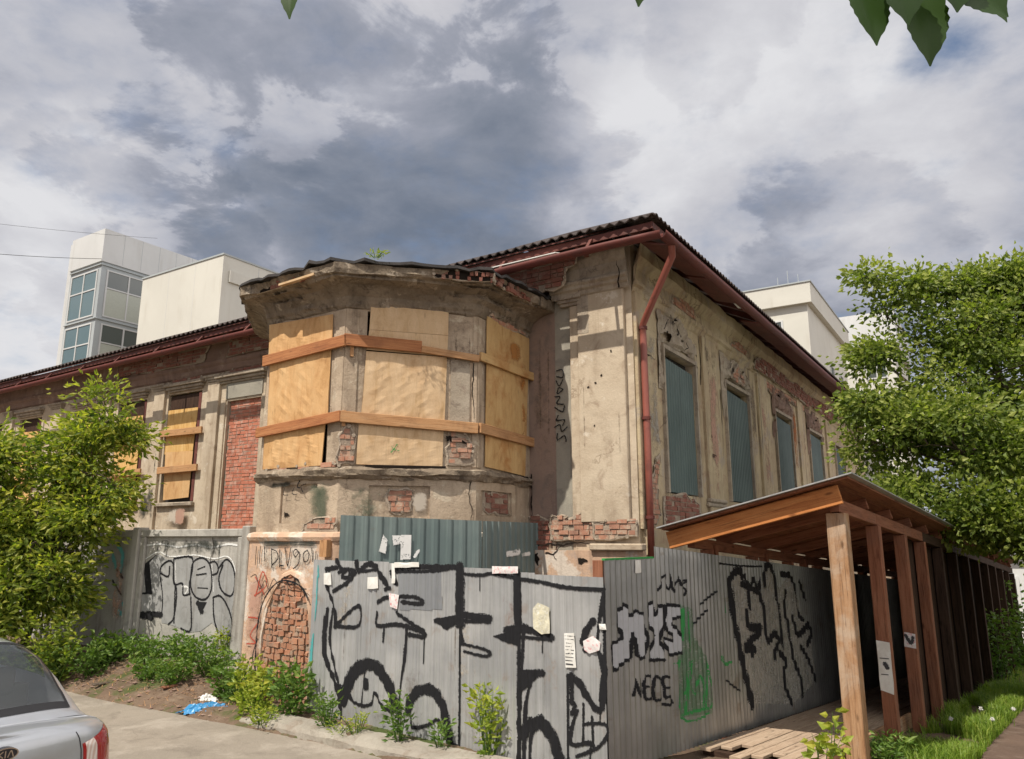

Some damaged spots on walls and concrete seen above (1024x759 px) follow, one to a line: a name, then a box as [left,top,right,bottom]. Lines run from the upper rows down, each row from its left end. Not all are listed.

spalling [432,269,533,305]
spalling [656,294,698,389]
spalling [719,341,838,454]
spalling [265,423,358,471]
spalling [444,431,476,467]
spalling [383,486,426,516]
spalling [482,491,510,516]
spalling [652,453,701,528]
spalling [301,516,339,532]
spalling [528,512,639,550]